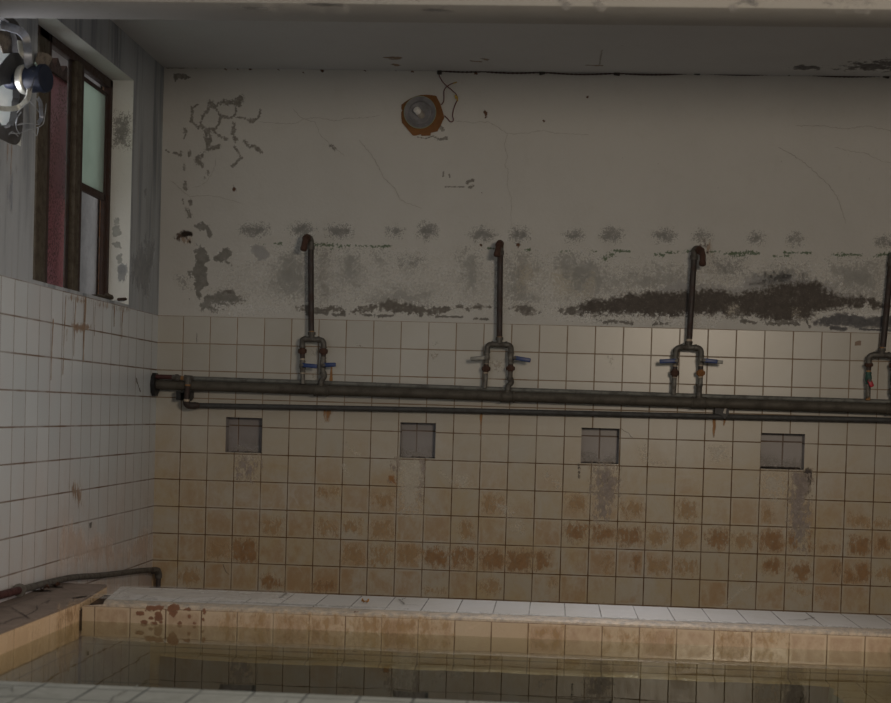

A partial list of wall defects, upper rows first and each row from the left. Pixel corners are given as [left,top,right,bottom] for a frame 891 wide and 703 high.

flaking render [165,149,213,238]
flaking render [176,244,246,313]
water stain [211,221,497,321]
water stain [503,225,891,328]
water stain [566,462,835,593]
corrosion [136,603,206,625]